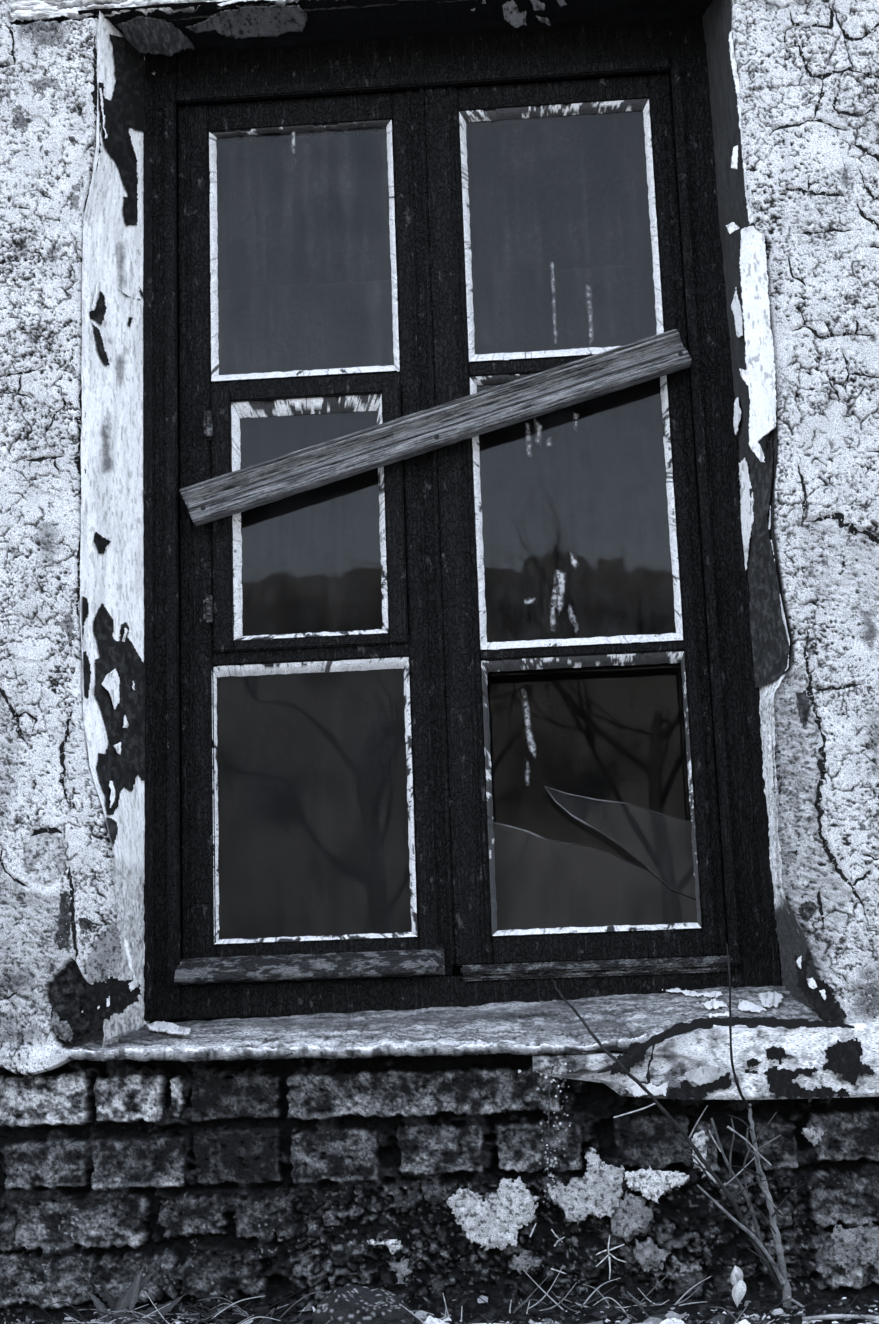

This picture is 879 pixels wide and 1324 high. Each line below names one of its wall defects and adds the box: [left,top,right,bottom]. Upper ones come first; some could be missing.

peeling [99,0,307,226]
crack [770,2,879,398]
crack [0,366,86,499]
spalling [726,31,818,922]
crack [798,465,879,545]
crack [0,688,72,836]
peeling [56,596,145,848]
crack [795,629,879,928]
spalling [23,833,146,1044]
crack [569,1016,855,1097]
peeling [610,1038,875,1103]
peeling [662,947,847,1023]